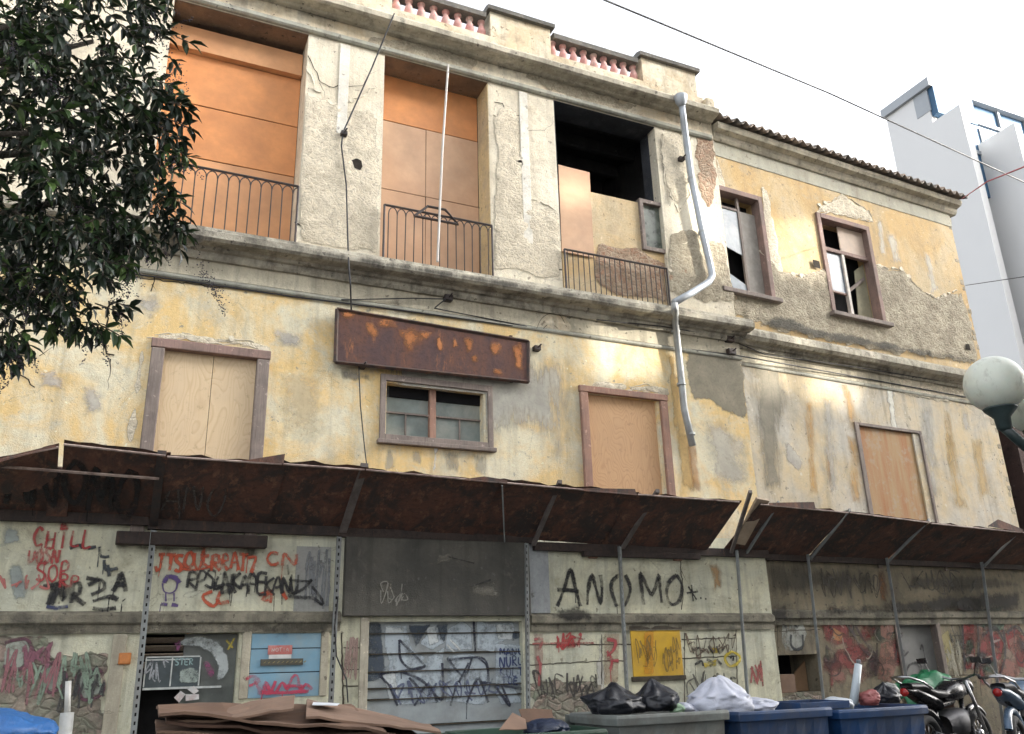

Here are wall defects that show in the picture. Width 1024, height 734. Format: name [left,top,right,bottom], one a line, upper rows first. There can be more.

flaking render [661,132,725,212]
flaking render [595,187,977,363]
corrosion [366,319,391,337]
corrosion [401,330,477,362]
corrosion [491,343,522,369]
water stain [887,390,897,427]